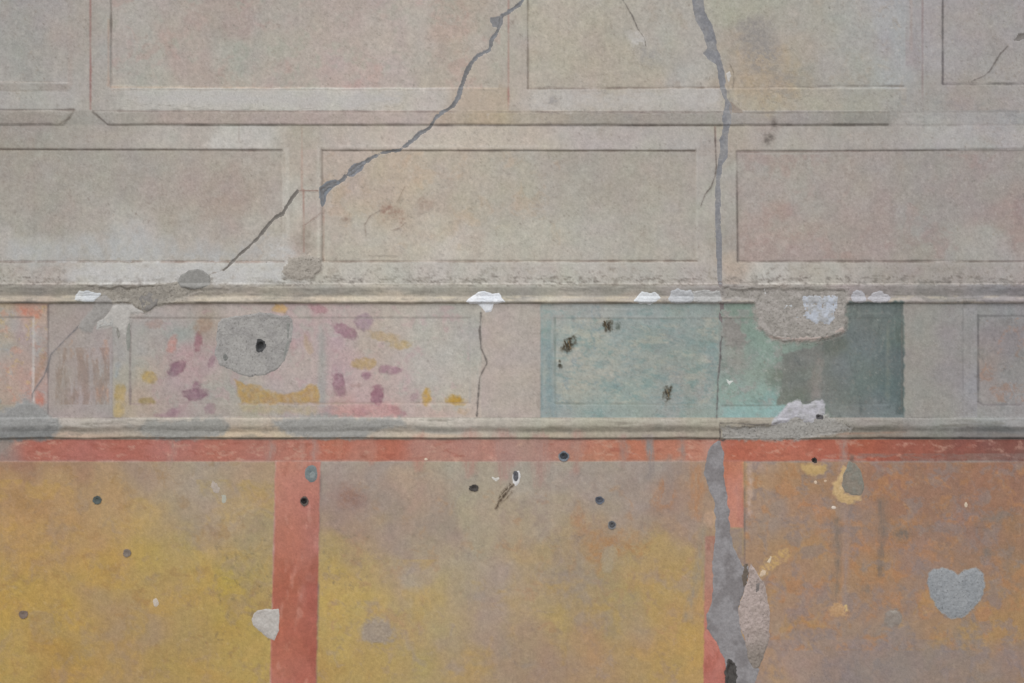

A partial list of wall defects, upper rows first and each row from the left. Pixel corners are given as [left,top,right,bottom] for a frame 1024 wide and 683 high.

crack [210,0,524,275]
crack [692,0,770,442]
spalling [75,269,211,351]
peeling [466,291,505,312]
spalling [634,282,891,347]
crack [475,311,489,418]
spalling [718,398,855,444]
spalling [799,453,864,505]
flaking render [738,546,793,668]